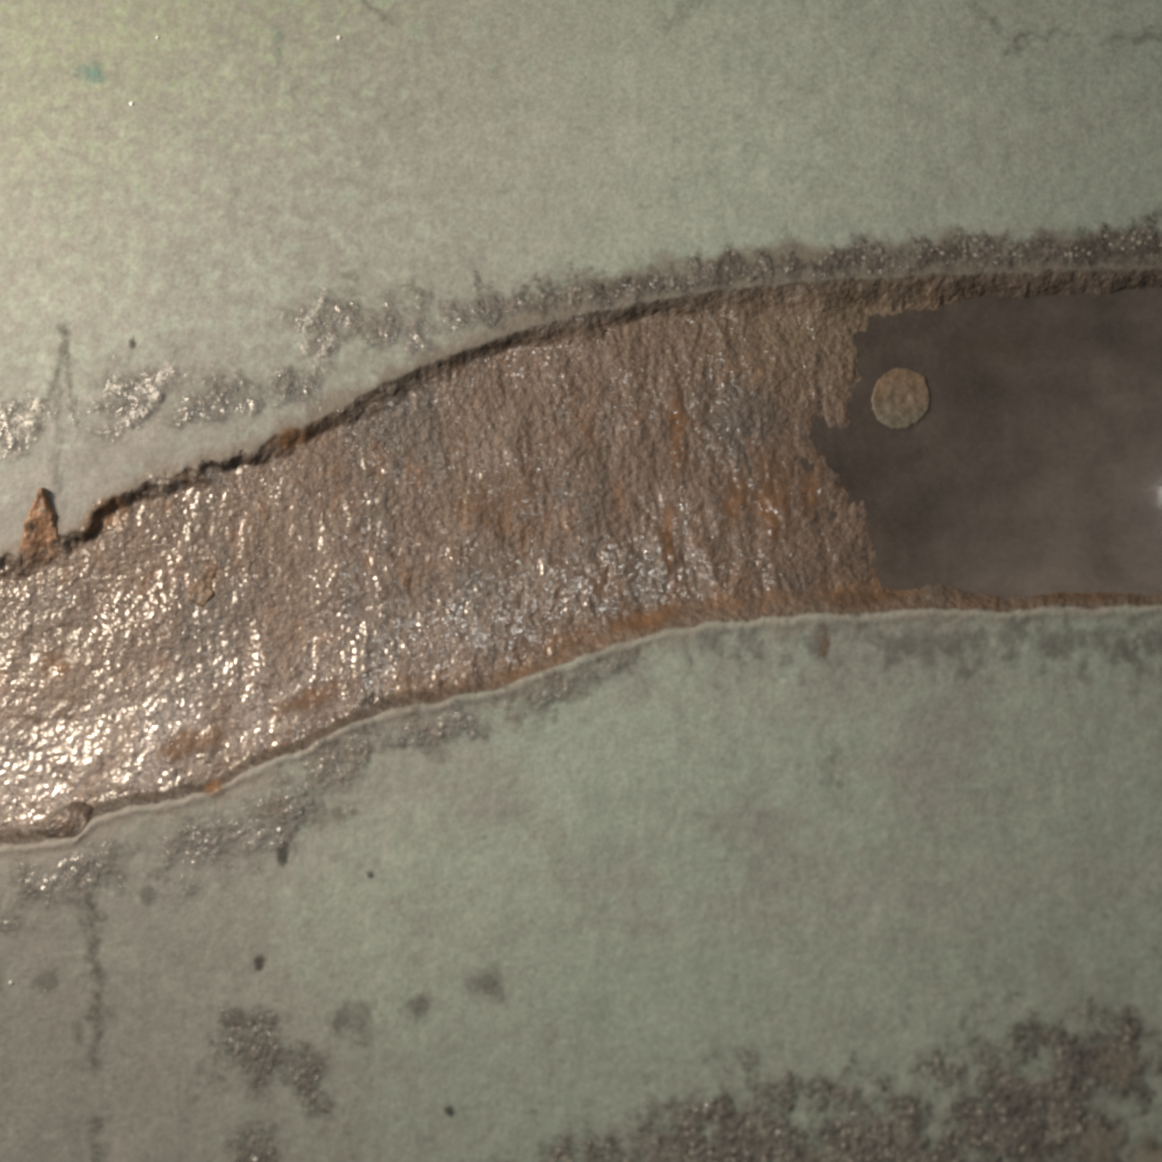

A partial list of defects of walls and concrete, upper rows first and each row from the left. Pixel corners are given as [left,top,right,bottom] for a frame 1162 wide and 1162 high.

corrosion [17,487,62,577]
corrosion [84,500,128,533]
corrosion [724,473,792,542]
corrosion [535,624,591,656]
corrosion [270,684,335,721]
corrosion [161,726,221,760]
leakage [210,1009,330,1112]